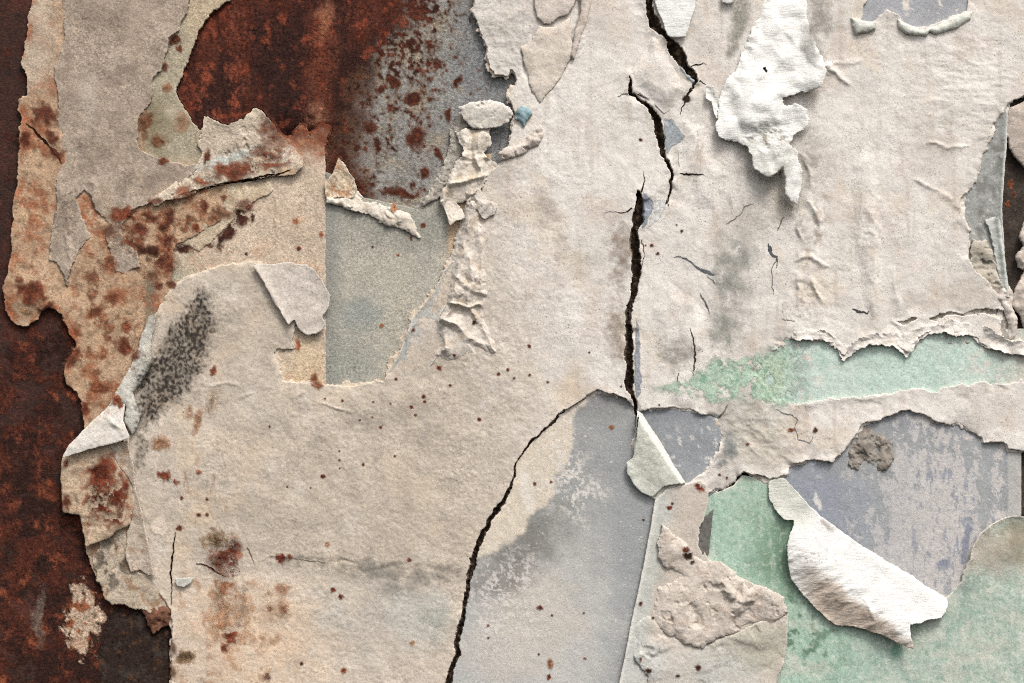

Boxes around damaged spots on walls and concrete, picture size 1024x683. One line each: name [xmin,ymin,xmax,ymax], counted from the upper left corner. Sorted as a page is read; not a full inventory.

corrosion [8,102,62,158]
corrosion [0,255,140,683]
damp [136,293,215,456]
corrosion [197,513,241,652]
corrosion [105,0,471,290]
peeling [171,125,466,385]
crack [445,399,584,683]
peeling [452,323,722,683]
crack [605,0,706,437]
crack [674,256,716,384]
peeling [680,0,827,205]
peeling [768,410,1021,649]